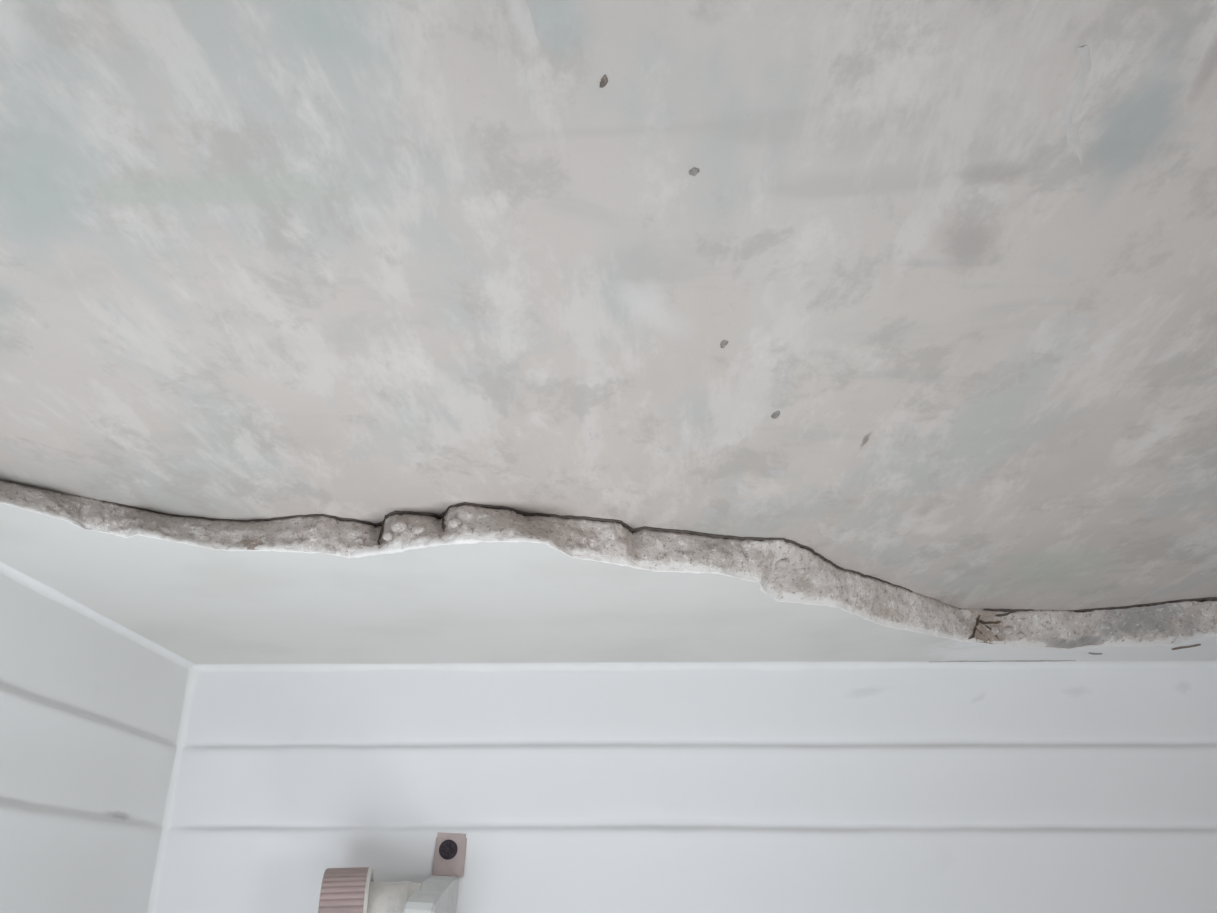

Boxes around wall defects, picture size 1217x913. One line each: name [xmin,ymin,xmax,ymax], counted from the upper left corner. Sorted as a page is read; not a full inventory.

spalling [0,480,1217,664]